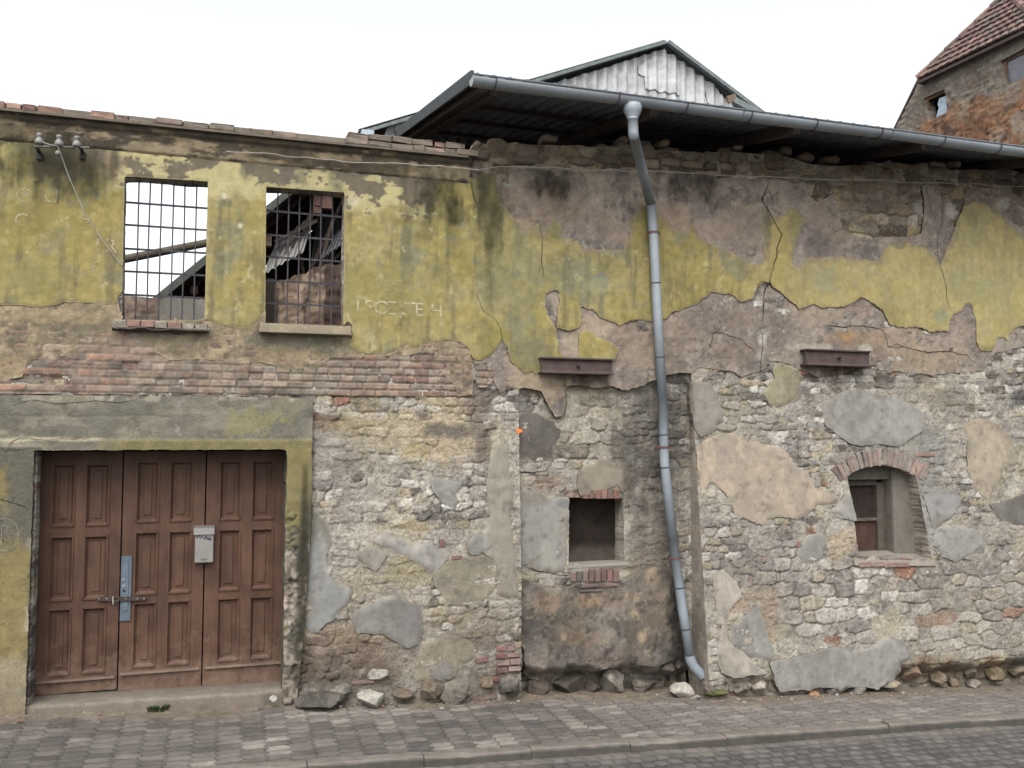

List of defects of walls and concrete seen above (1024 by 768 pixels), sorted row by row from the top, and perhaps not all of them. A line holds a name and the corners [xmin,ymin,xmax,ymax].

crack [701,178,783,374]
spalling [481,164,1024,268]
spalling [0,282,1024,417]
spalling [471,646,521,702]